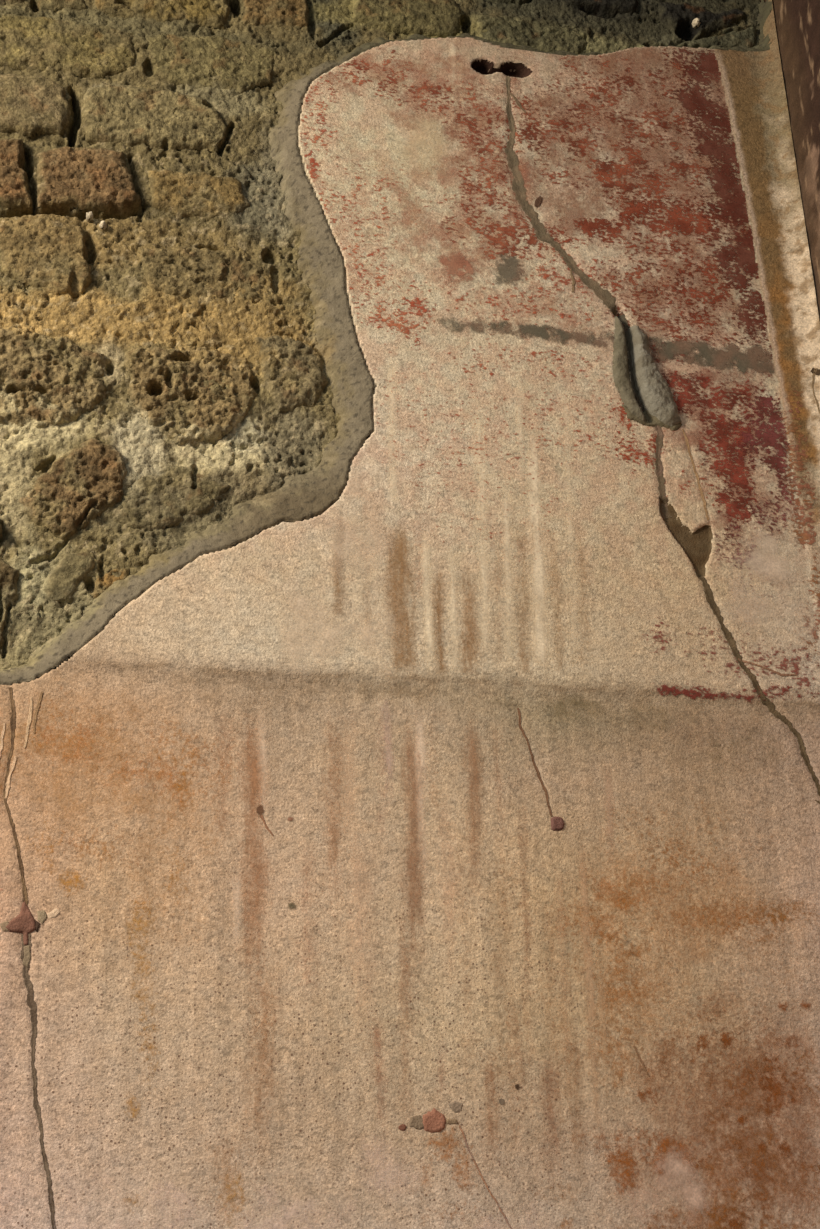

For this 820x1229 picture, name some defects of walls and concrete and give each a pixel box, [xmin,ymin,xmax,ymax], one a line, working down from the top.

crack [505,76,617,316]
flaking render [0,0,820,703]
damp [407,724,425,919]
damp [363,538,488,667]
damp [517,397,546,663]
crack [517,708,553,816]
crack [654,425,709,520]
crack [695,571,820,804]
crack [811,368,820,414]
crack [0,687,57,1229]
corrosion [638,1033,813,1229]